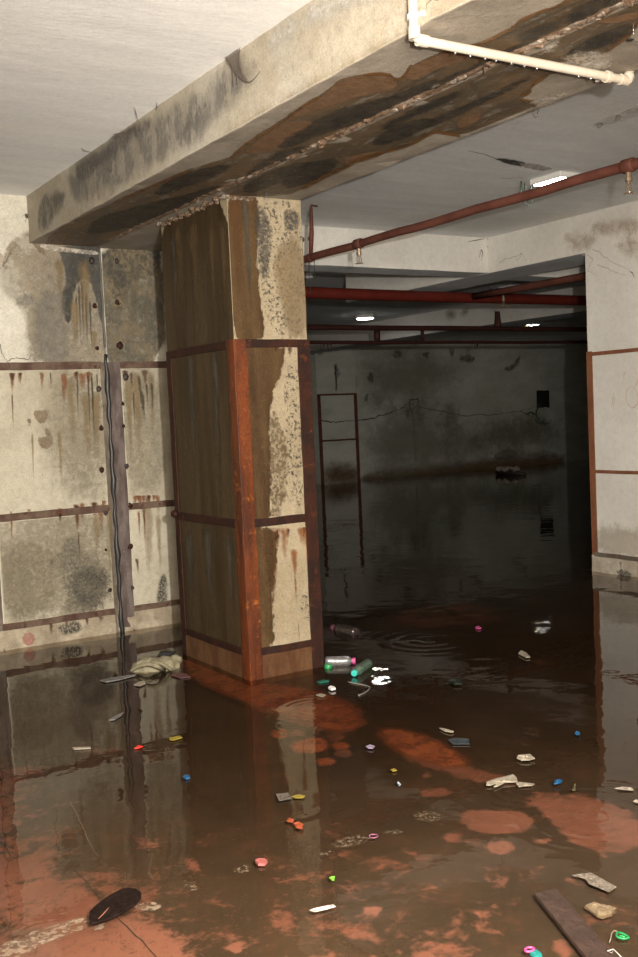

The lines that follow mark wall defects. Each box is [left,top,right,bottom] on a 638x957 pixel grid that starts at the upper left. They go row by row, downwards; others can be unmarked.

rust [41,372,99,437]
rust [123,370,153,425]
rust [228,195,311,648]
water stain [0,0,638,648]